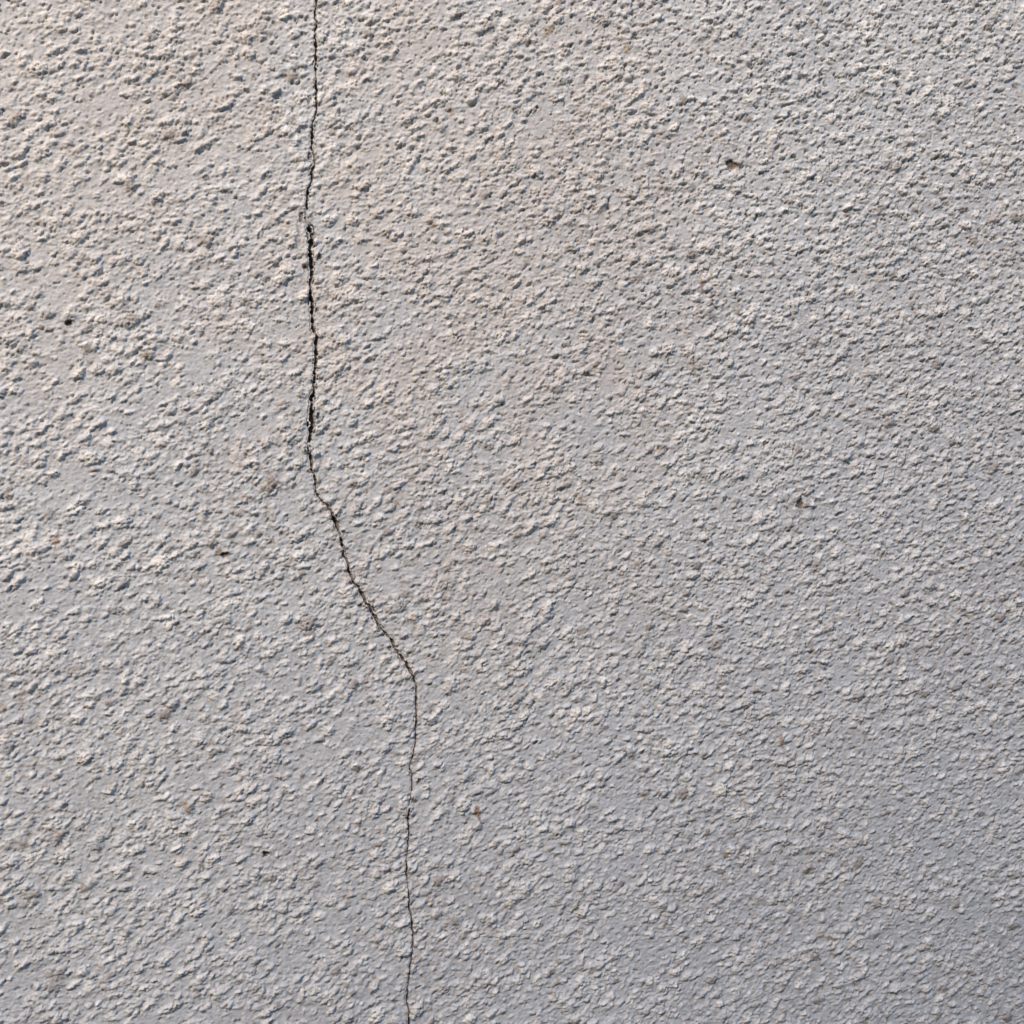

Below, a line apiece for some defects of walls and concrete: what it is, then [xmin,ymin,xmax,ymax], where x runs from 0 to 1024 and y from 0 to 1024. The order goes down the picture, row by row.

crack [298,0,422,1024]